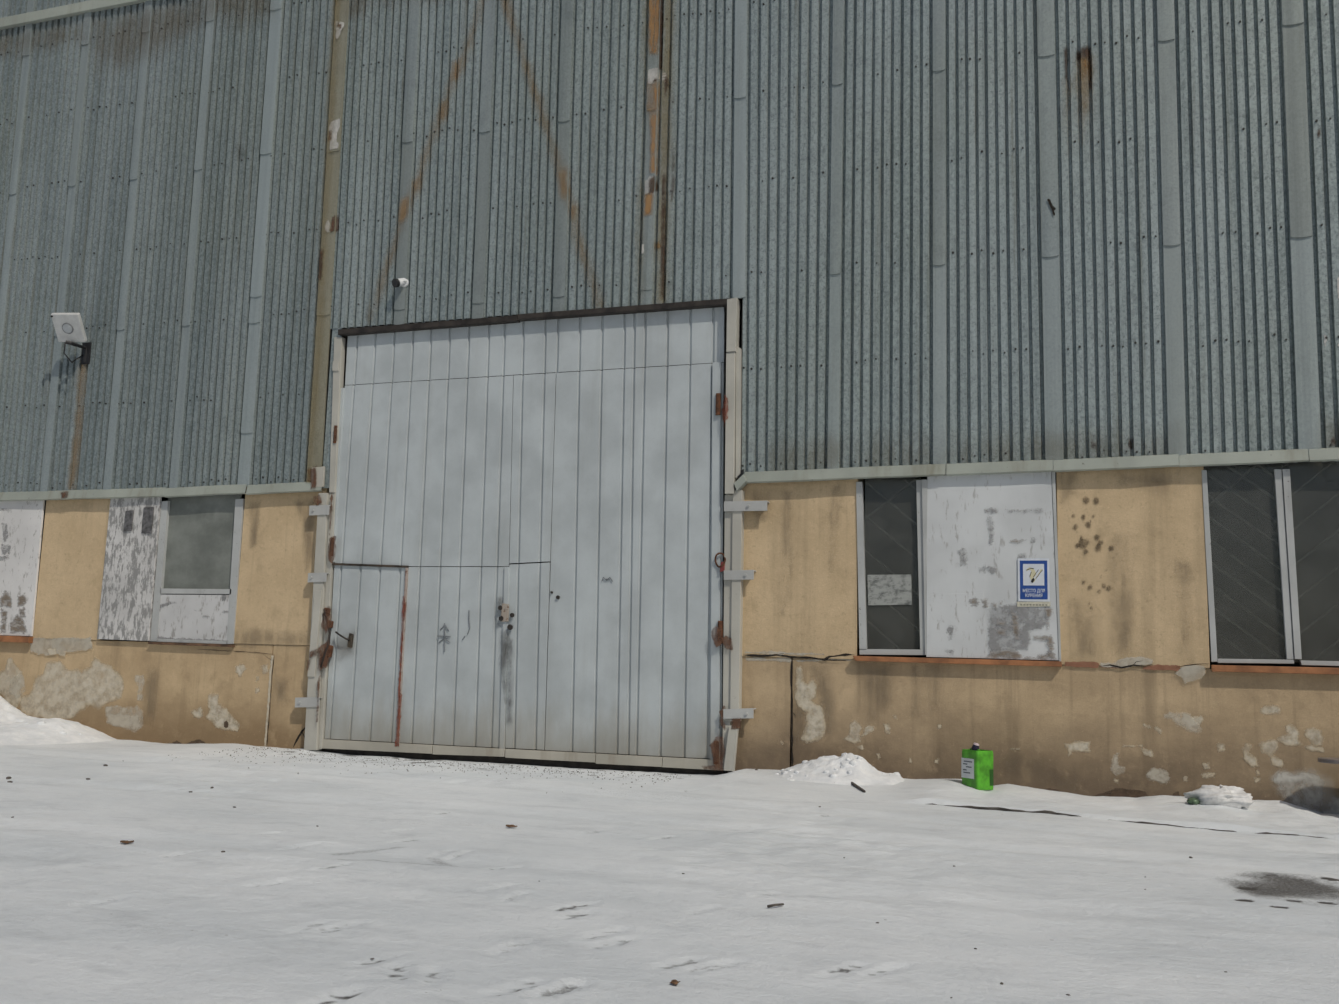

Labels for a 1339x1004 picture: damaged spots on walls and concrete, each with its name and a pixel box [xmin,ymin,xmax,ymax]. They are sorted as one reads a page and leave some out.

rust [1065,46,1092,88]
rust [642,0,673,294]
peeling [0,591,27,633]
peeling [0,648,143,729]
peeling [192,694,239,731]
rust [395,598,406,747]
rust [712,627,733,650]
peeling [745,651,851,743]
crack [746,653,852,766]
peeling [970,598,1117,668]
spalling [1096,745,1215,798]
peeling [1243,705,1324,783]